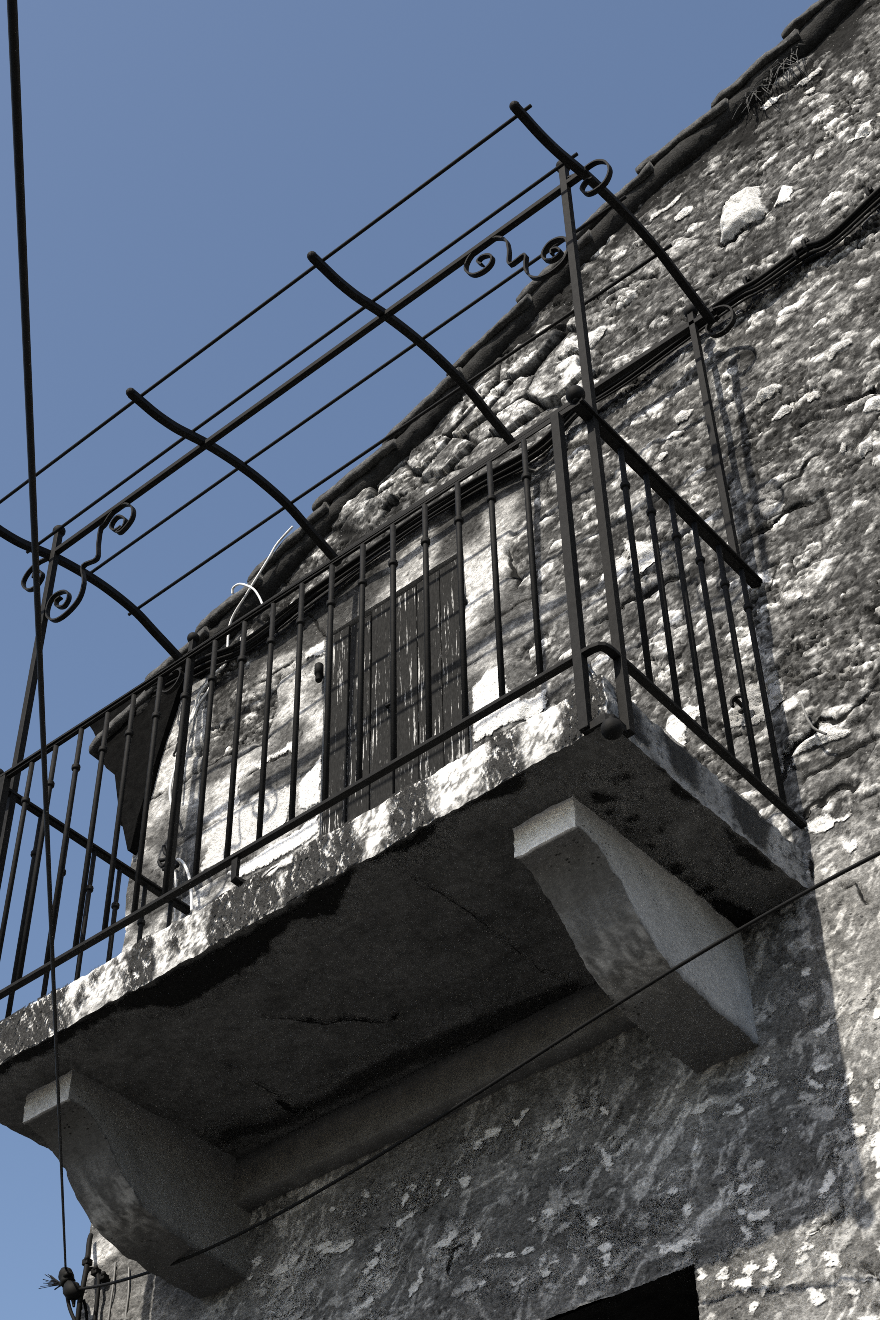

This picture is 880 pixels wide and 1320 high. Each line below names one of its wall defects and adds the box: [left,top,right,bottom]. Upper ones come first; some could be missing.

crack [263,1015,397,1025]